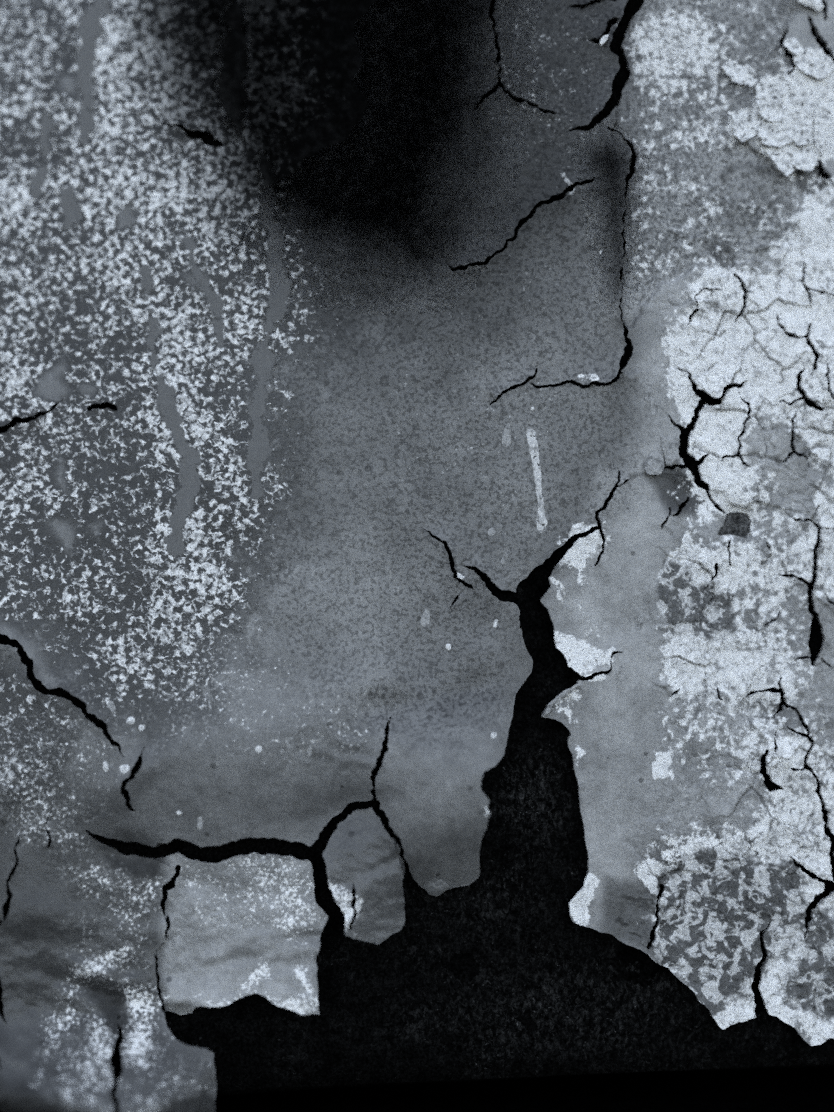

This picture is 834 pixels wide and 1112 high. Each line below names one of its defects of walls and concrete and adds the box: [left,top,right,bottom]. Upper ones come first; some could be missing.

water stain [28,107,84,230]
water stain [75,0,112,146]
water stain [139,264,203,561]
water stain [180,225,226,348]
crack [424,472,628,608]
crack [474,0,644,404]
crack [661,368,750,529]
peeling [613,0,834,328]
crack [0,634,143,811]
crack [87,717,409,1007]
peeling [156,585,834,1091]
crack [717,505,834,930]